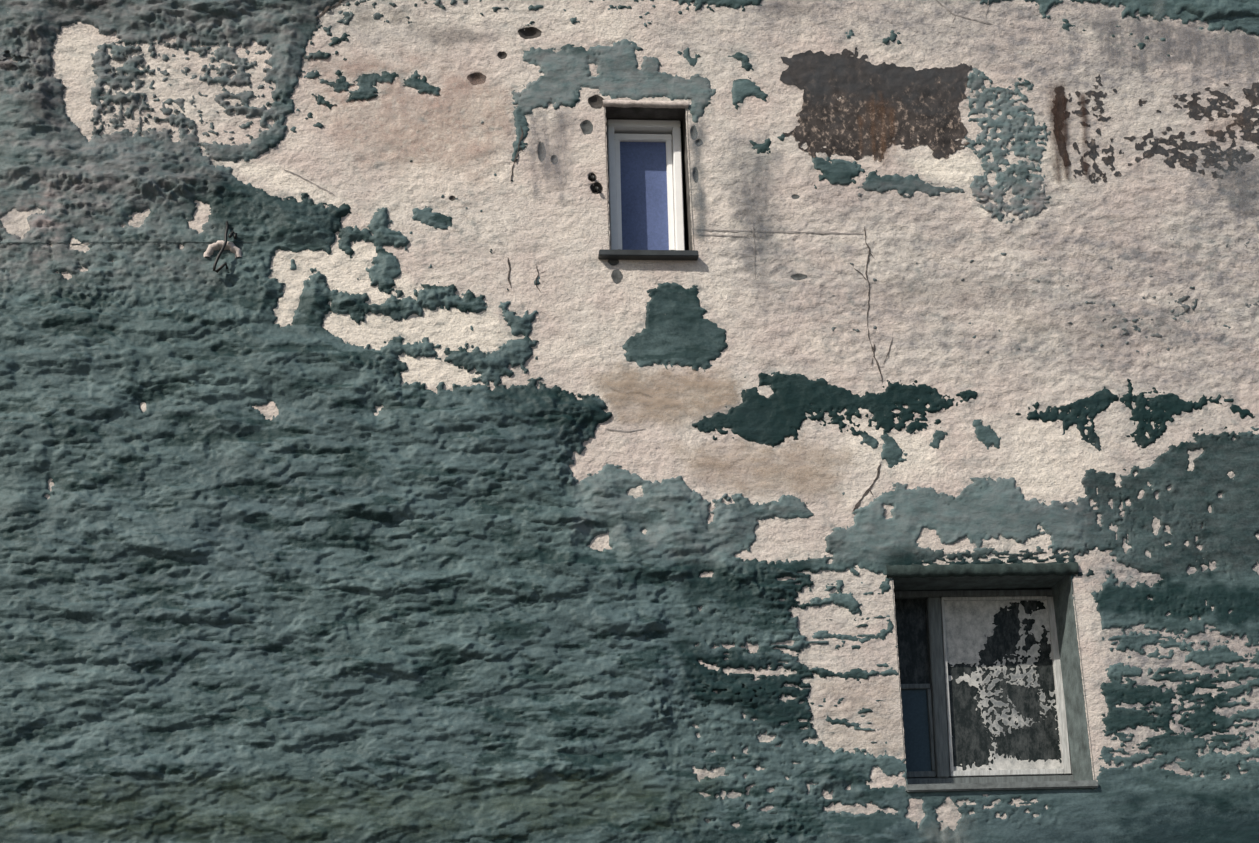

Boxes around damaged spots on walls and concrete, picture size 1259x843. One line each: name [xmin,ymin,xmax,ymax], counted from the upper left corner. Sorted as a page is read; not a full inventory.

rust [1053,97,1067,142]
peeling [48,0,1259,574]
crack [694,225,893,381]
peeling [698,565,906,764]
peeling [916,524,1259,789]
peeling [692,765,776,814]
peeling [866,766,907,789]
peeling [806,782,1048,832]